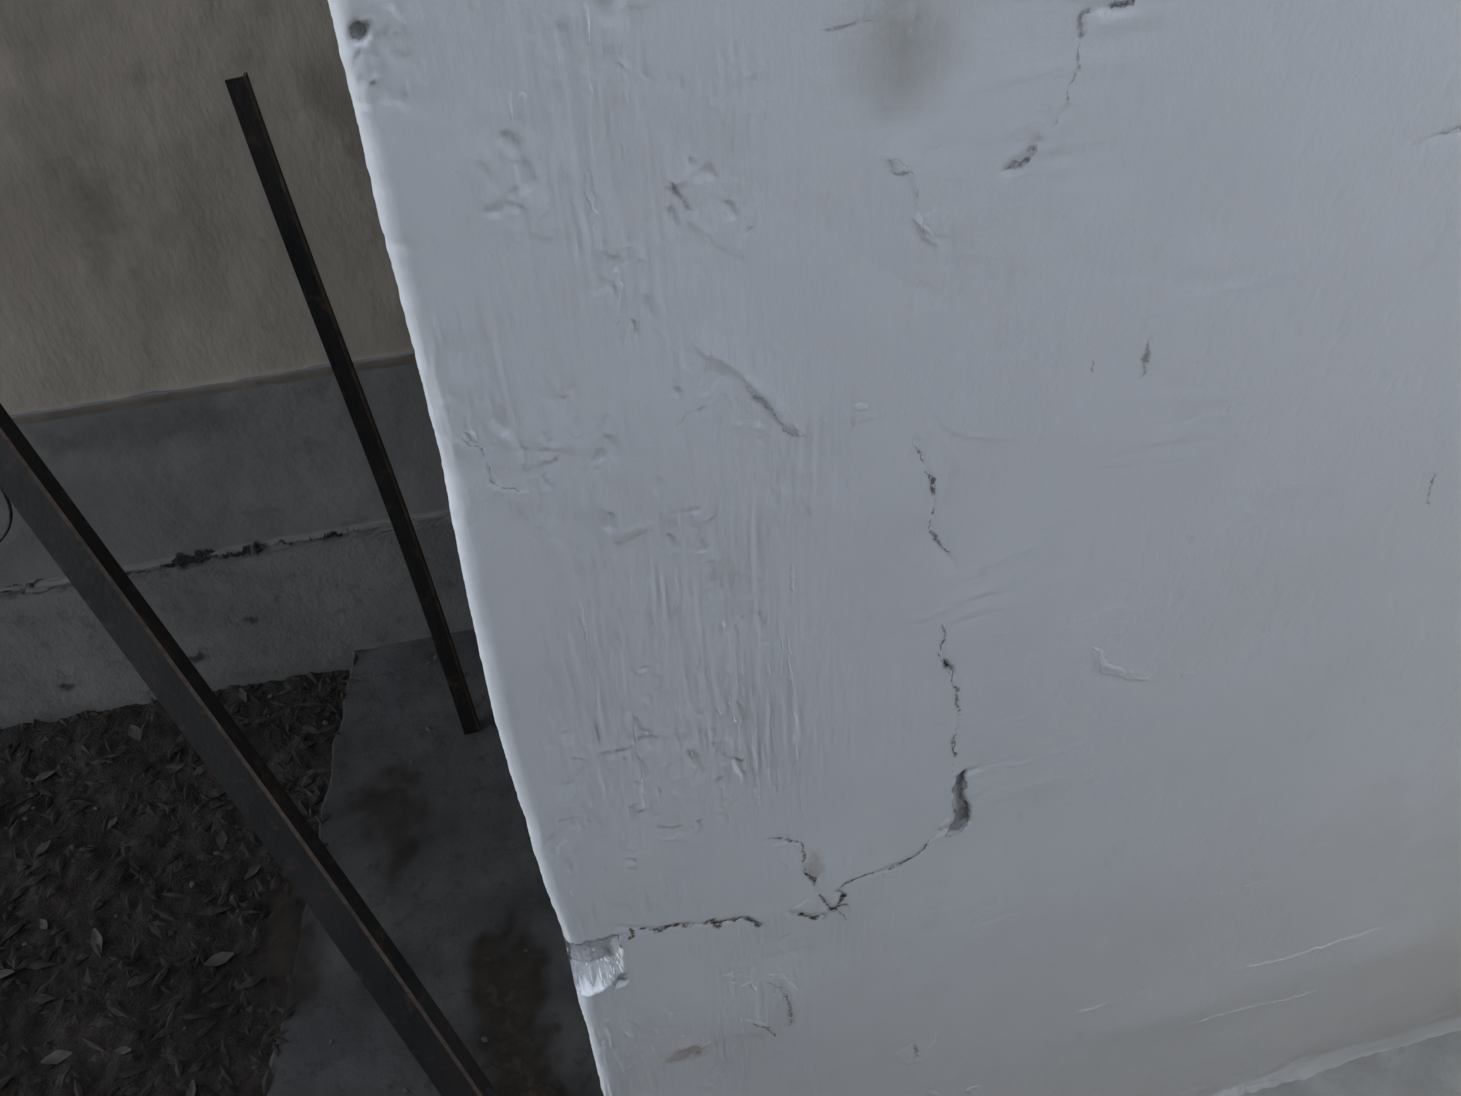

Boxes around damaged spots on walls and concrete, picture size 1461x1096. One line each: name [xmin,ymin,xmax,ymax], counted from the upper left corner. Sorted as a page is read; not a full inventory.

crack [1077,0,1135,60]
crack [917,449,949,552]
crack [938,630,960,757]
spalling [945,771,970,836]
crack [770,818,952,920]
spalling [561,927,627,986]
crack [628,917,762,940]